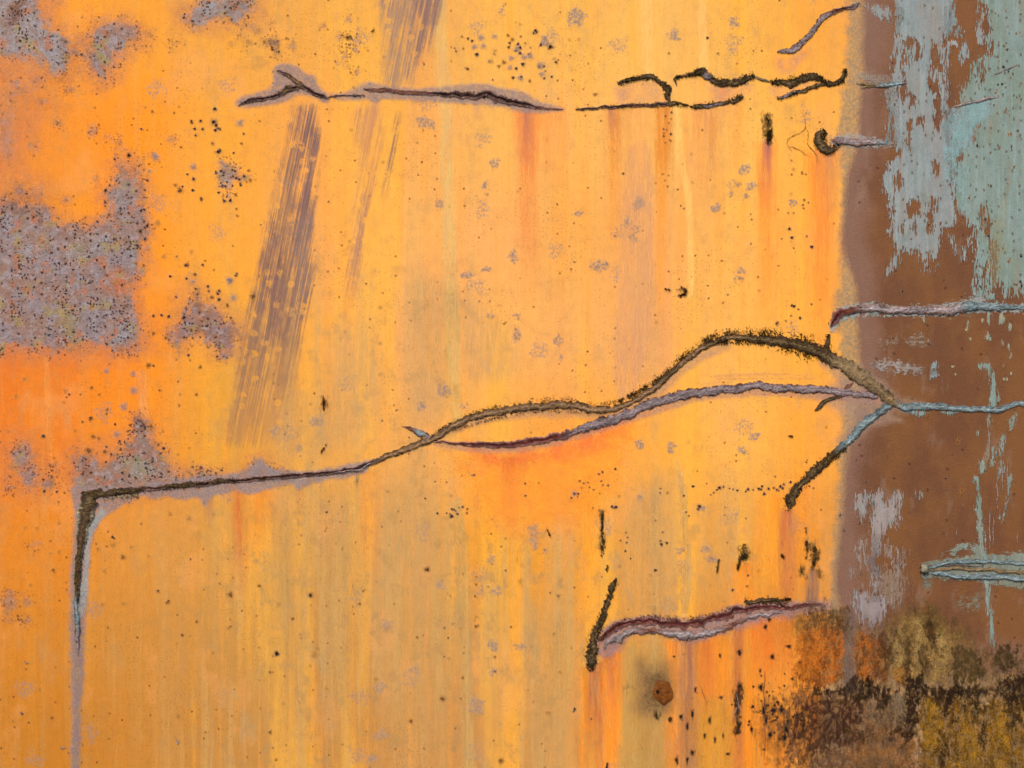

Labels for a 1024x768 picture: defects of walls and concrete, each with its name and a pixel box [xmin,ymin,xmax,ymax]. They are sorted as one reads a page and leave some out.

spalling [184,250,238,308]
crack [236,2,906,164]
peeling [865,0,1024,359]
crack [69,296,1024,768]